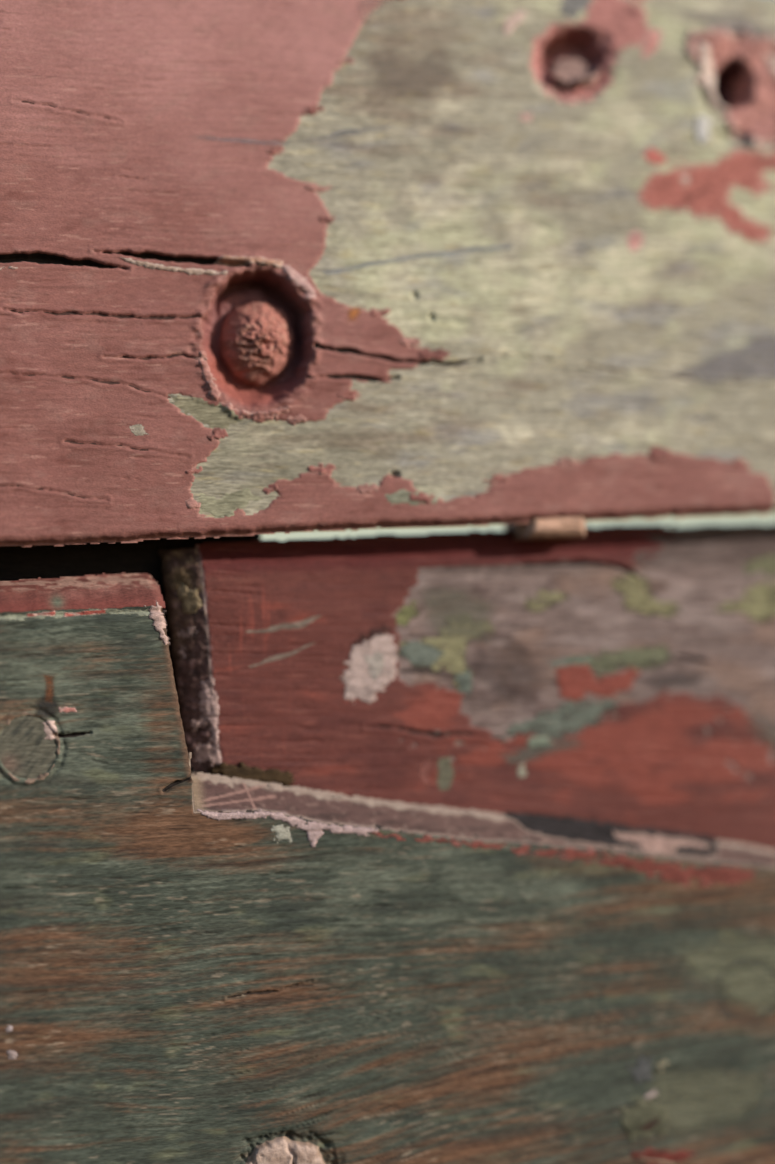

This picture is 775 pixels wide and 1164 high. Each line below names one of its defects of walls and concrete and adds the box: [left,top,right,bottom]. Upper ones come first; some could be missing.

peeling [529,0,664,105]
peeling [636,25,775,243]
crack [0,252,284,275]
crack [10,310,200,320]
peeling [399,337,450,361]
crack [24,354,207,398]
crack [64,440,148,451]
peeling [642,444,673,461]
peeling [339,625,444,704]
peeling [555,663,642,702]
peeling [436,757,455,791]
peeling [371,811,756,888]